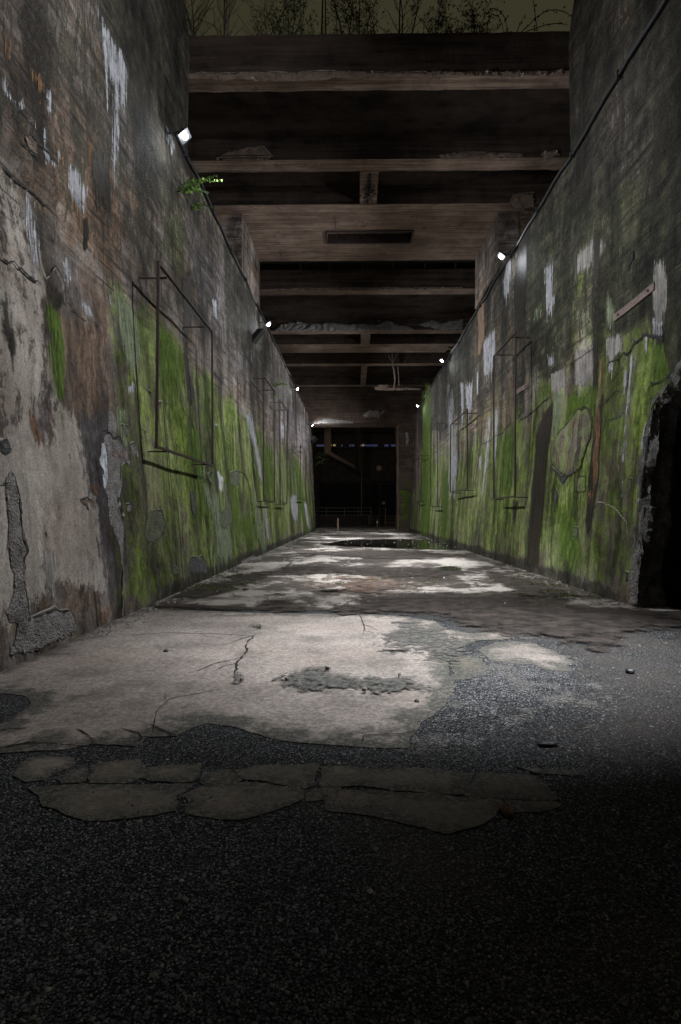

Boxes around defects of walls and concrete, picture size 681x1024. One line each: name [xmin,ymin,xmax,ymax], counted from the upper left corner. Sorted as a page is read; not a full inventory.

leakage [30,11,127,250]
spalling [6,471,77,656]
spalling [104,411,138,567]
leakage [242,409,273,541]
leakage [461,298,495,427]
leakage [479,410,498,495]
leakage [503,355,565,569]
leakage [537,263,555,320]
leakage [575,229,666,569]
spalling [625,361,681,608]
crack [123,633,256,742]
spalling [271,665,435,694]